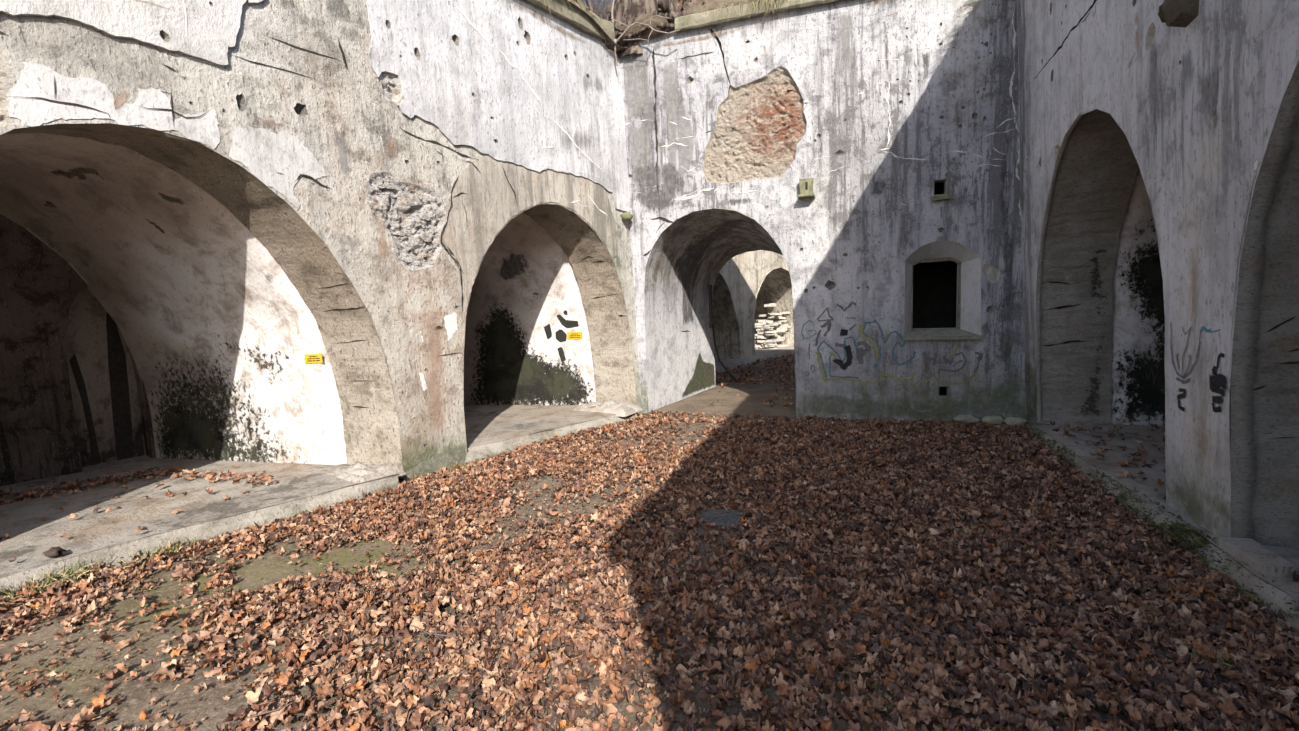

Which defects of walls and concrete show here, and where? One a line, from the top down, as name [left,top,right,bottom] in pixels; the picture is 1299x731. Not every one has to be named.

spalling [0,51,17,128]
peeling [52,168,105,180]
spalling [366,171,460,275]
spalling [704,66,807,184]
crack [1033,0,1097,80]
mould [148,335,307,463]
damp [444,312,458,341]
damp [470,301,593,405]
mould [1081,216,1165,426]